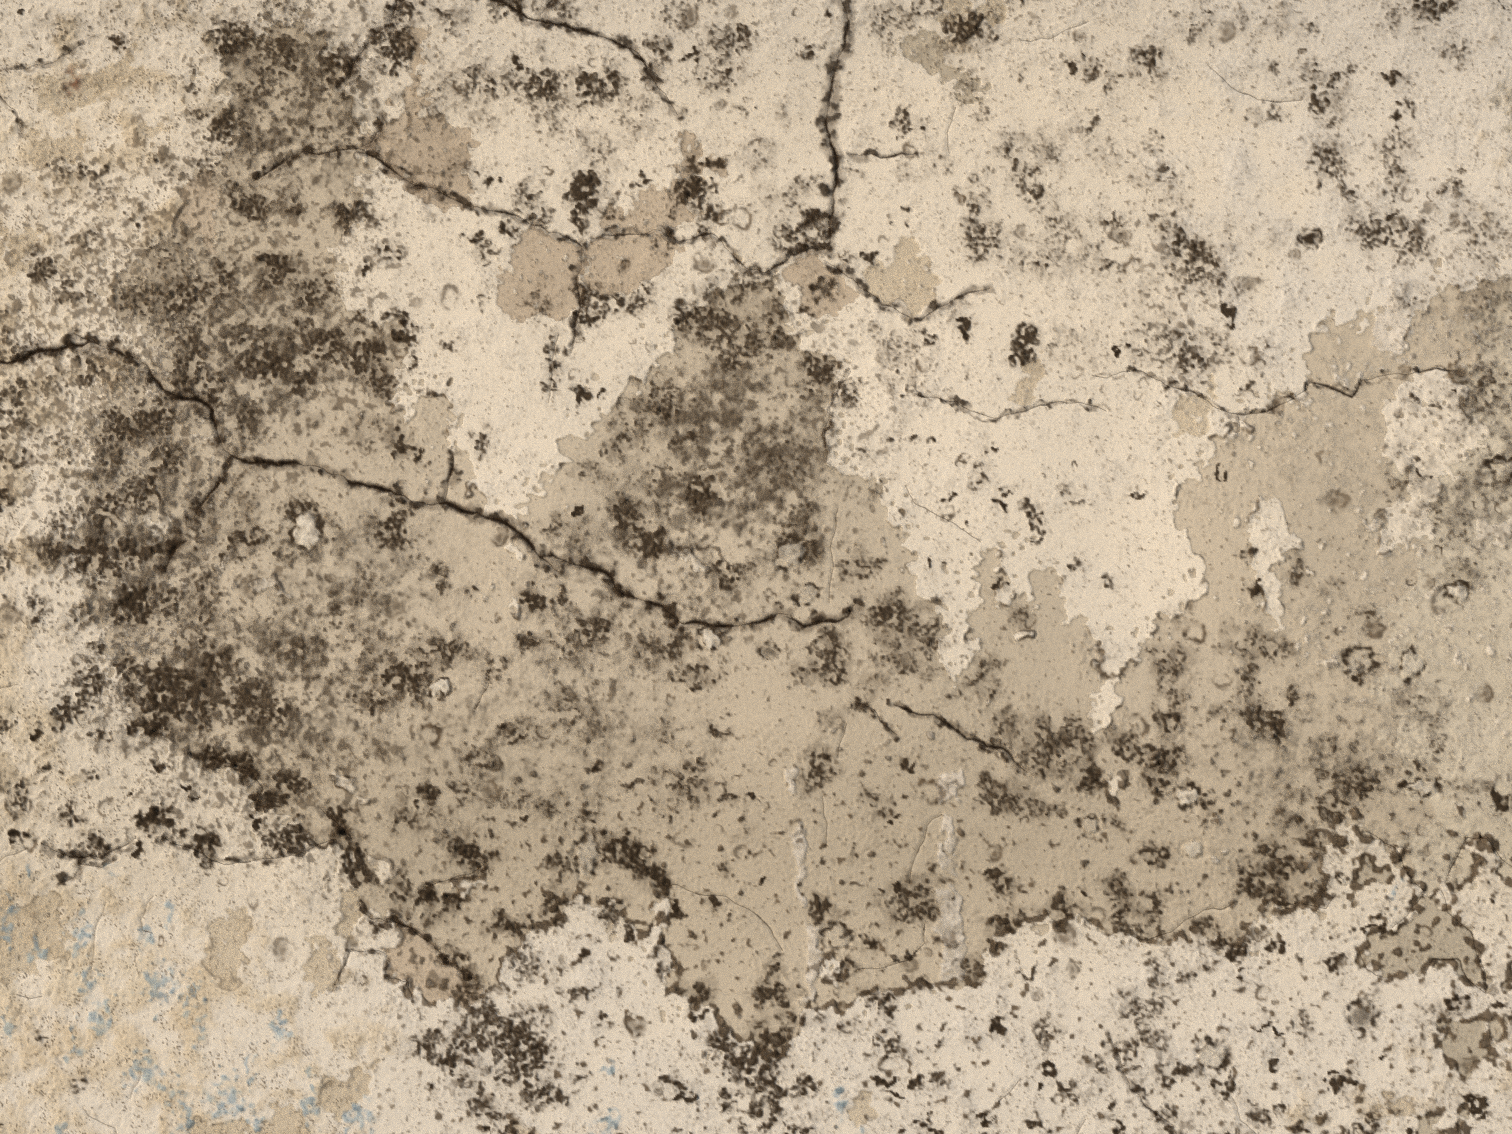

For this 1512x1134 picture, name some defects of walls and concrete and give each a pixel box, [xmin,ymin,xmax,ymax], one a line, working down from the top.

peeling [892,0,1006,104]
water stain [461,138,651,266]
peeling [496,130,727,323]
crack [252,0,985,344]
peeling [782,250,859,324]
water stain [0,232,418,851]
crack [0,329,863,635]
crack [917,392,1091,422]
crack [1127,366,1449,415]
water stain [412,944,594,1134]
water stain [679,821,857,1134]
peeling [1355,896,1492,993]